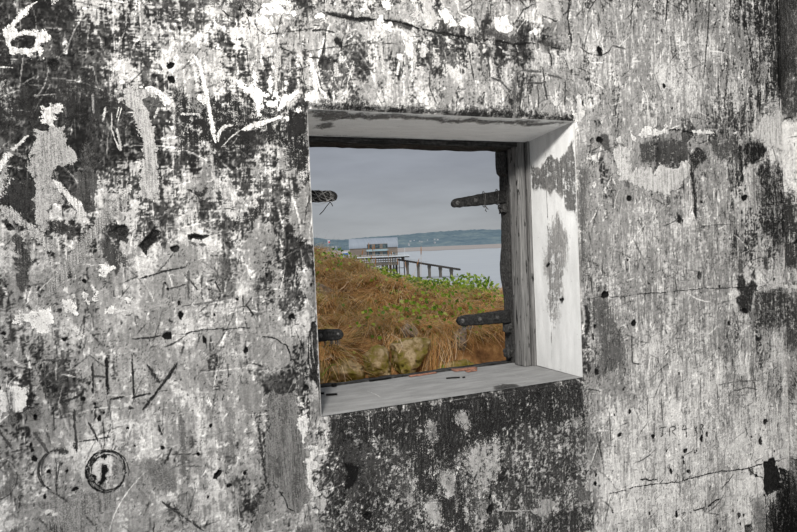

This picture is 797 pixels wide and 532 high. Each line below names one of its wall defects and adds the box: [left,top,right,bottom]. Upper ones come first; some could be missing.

water stain [779,0,797,122]
water stain [576,163,592,282]
water stain [639,138,698,219]
water stain [583,293,627,381]
peeling [3,487,119,532]
water stain [320,379,599,532]
crack [610,458,797,516]
spalling [748,450,790,532]